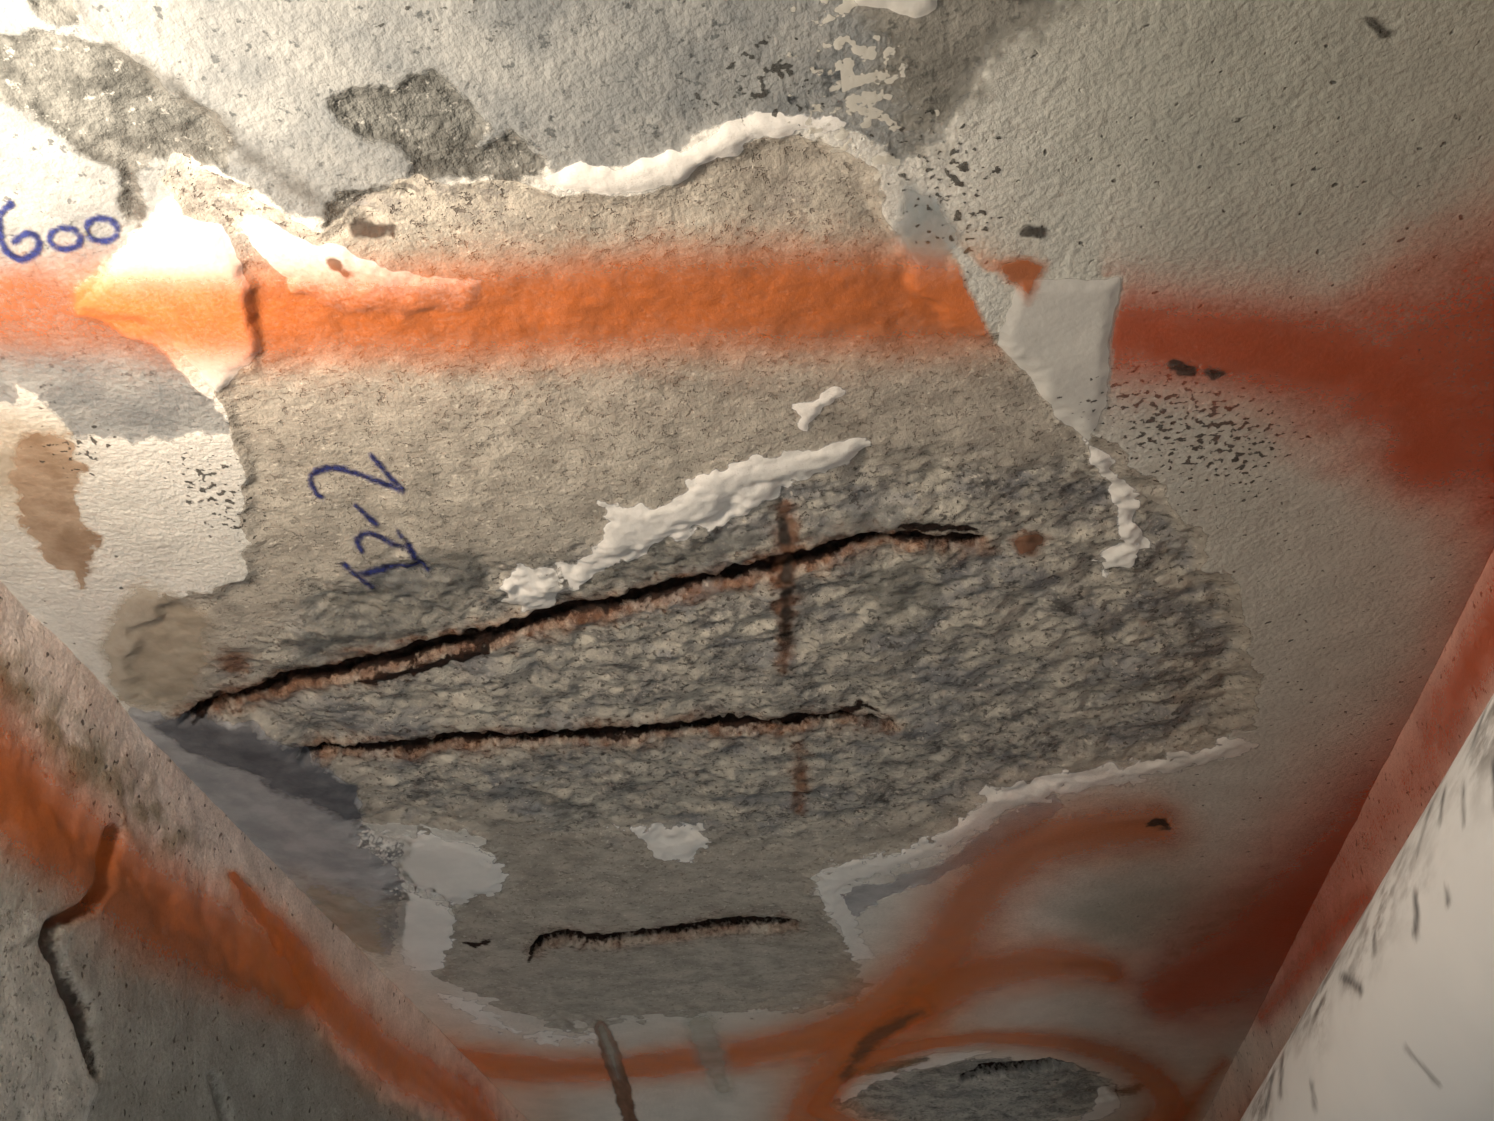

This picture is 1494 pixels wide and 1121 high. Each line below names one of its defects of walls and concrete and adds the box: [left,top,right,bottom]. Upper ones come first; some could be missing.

water stain [0,433,102,589]
spalling [0,0,1264,1047]
crack [177,523,994,725]
corrosion [773,501,799,674]
crack [301,699,897,762]
corrosion [793,743,808,813]
crack [101,824,118,844]
crack [38,899,94,1076]
crack [463,939,491,948]
crack [527,916,790,963]
corrosion [594,1021,638,1121]
spalling [831,1050,1143,1121]